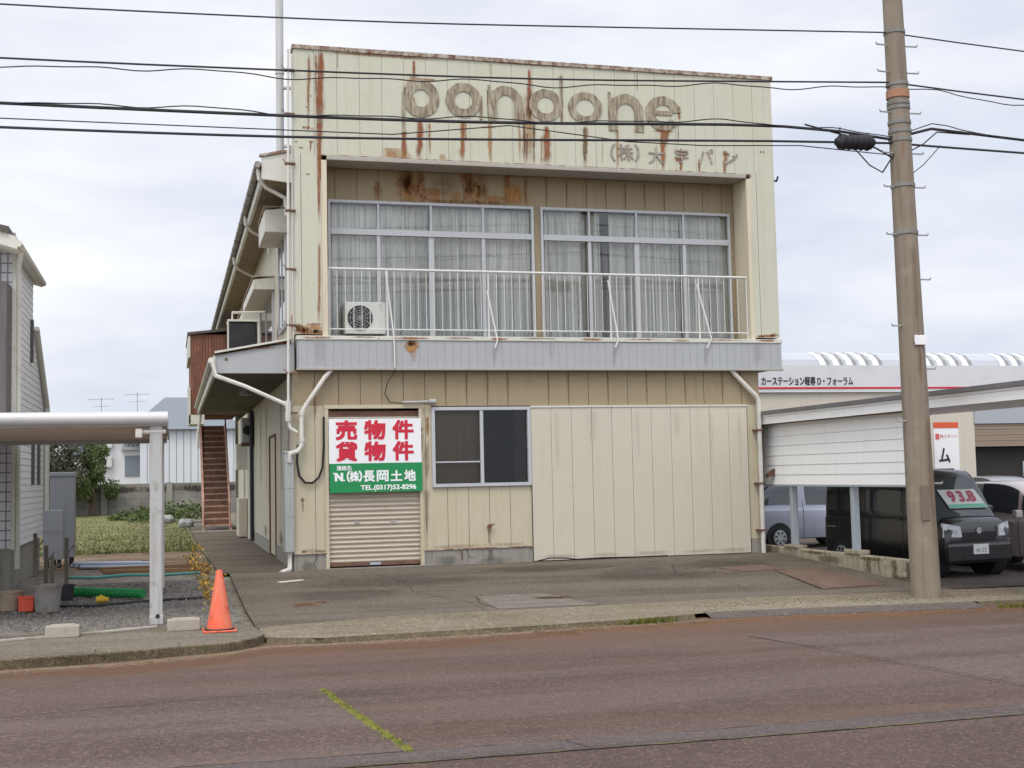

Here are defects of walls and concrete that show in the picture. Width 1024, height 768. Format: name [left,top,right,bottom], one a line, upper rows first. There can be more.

corrosion [346,53,434,84]
corrosion [295,54,324,211]
corrosion [386,122,431,158]
corrosion [398,123,527,205]
corrosion [501,62,558,160]
corrosion [657,107,684,170]
corrosion [291,246,330,338]
corrosion [397,337,428,353]